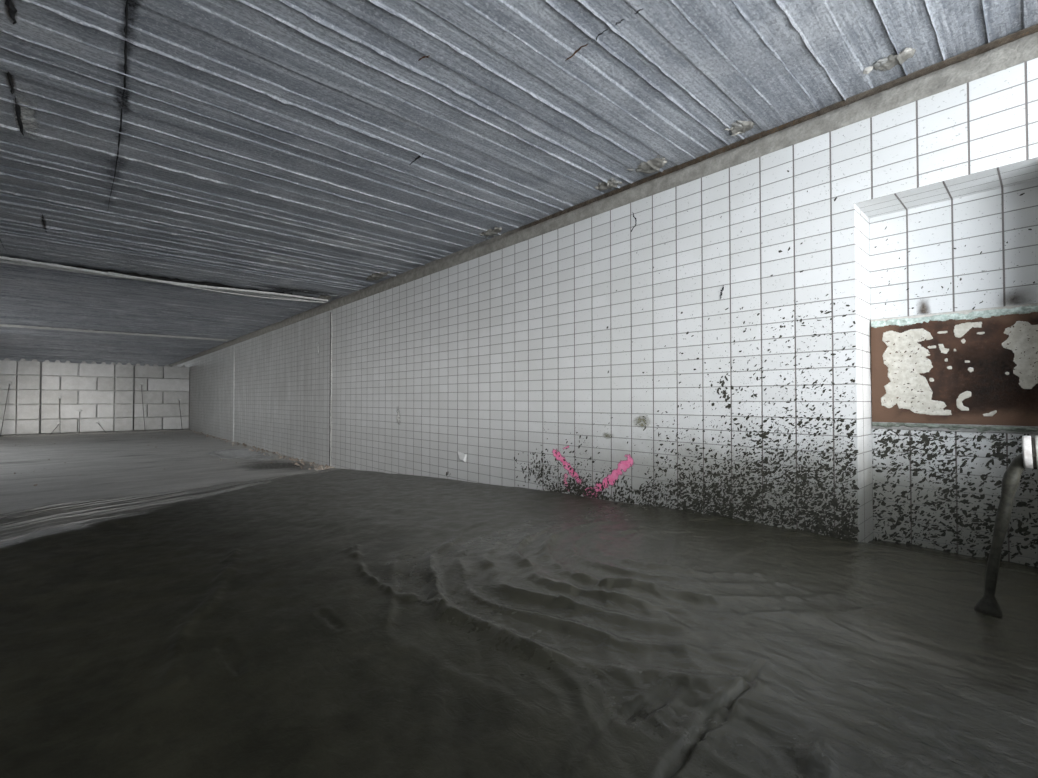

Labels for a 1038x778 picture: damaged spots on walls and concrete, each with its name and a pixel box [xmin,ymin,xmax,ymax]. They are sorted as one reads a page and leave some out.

crack [108,0,140,207]
rust [870,329,949,412]
rust [958,324,1038,407]